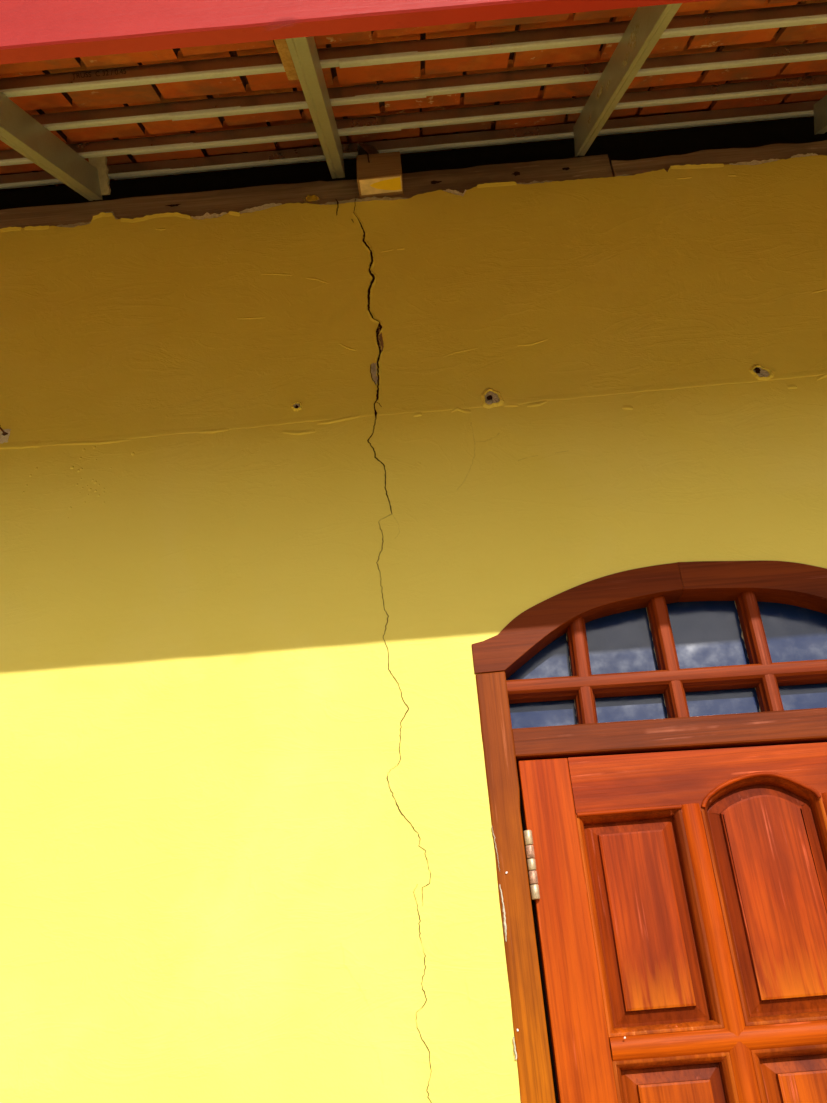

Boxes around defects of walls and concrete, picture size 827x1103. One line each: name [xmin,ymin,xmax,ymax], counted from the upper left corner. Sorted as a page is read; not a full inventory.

peeling [670,153,817,169]
peeling [443,180,552,196]
spalling [93,203,282,223]
crack [336,199,432,1103]